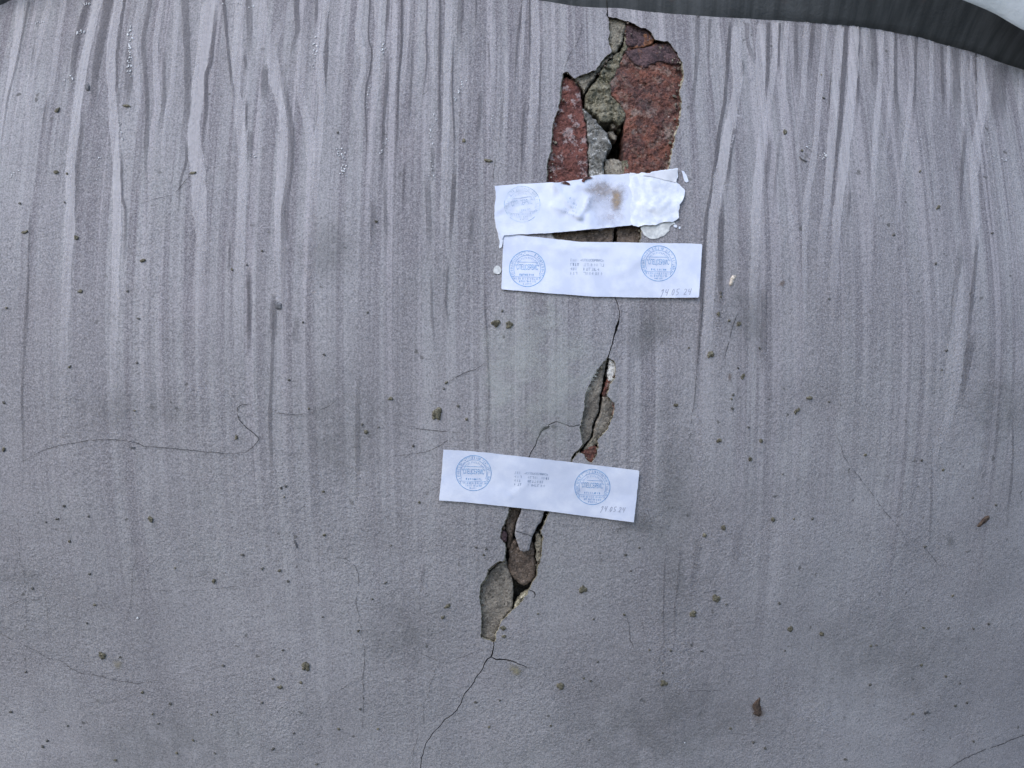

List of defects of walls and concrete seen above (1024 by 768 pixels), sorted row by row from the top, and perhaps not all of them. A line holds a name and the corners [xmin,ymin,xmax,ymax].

damp [204,0,254,109]
damp [379,0,403,154]
spalling [546,15,684,183]
damp [706,28,735,215]
damp [831,25,861,144]
spalling [551,225,642,243]
crack [607,297,620,358]
crack [25,404,259,460]
crack [529,421,580,458]
spalling [571,358,616,463]
spalling [479,507,550,642]
crack [413,641,526,768]